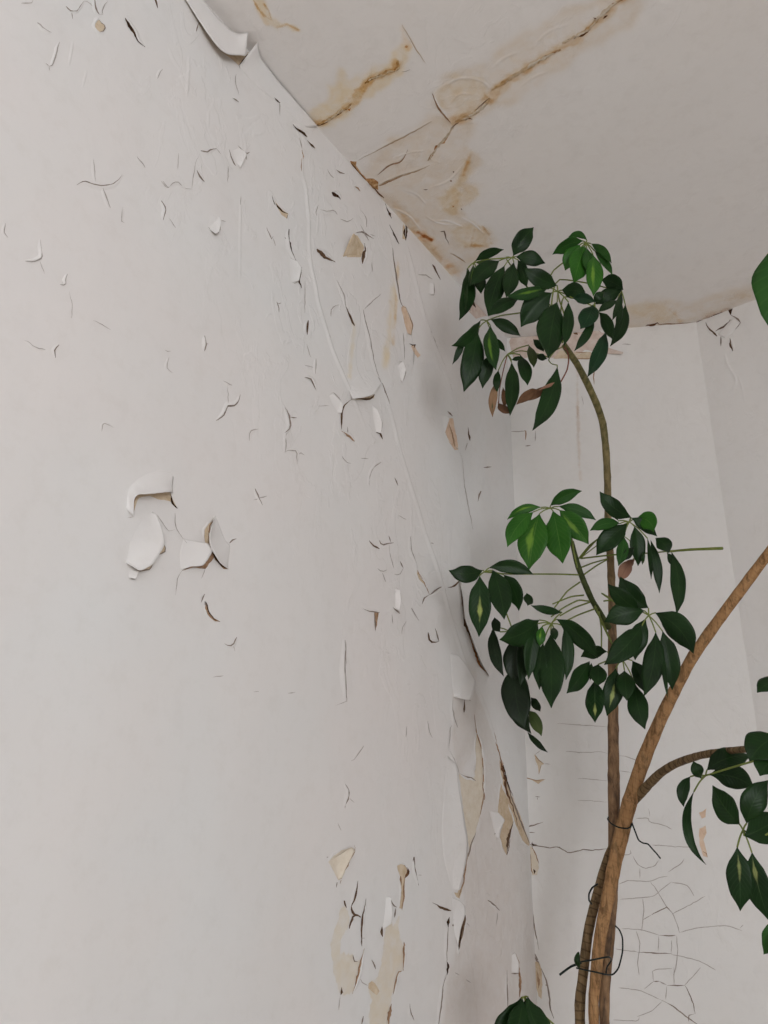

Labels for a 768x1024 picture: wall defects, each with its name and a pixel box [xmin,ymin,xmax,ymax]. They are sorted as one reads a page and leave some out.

peeling [186,0,318,127]
damp [317,61,409,126]
spalling [350,160,384,198]
damp [358,0,622,263]
peeling [343,228,374,264]
peeling [324,370,383,439]
peeling [126,471,236,595]
peeling [201,594,221,623]
peeling [434,581,514,958]
peeling [339,899,379,1005]
peeling [380,863,410,937]
crack [529,796,743,1024]